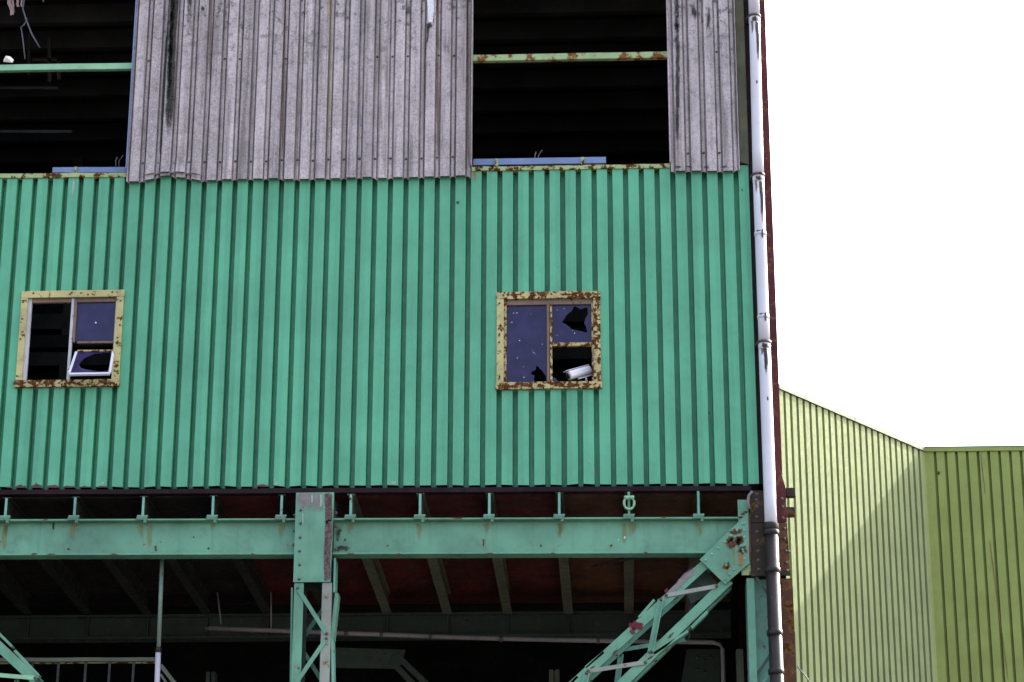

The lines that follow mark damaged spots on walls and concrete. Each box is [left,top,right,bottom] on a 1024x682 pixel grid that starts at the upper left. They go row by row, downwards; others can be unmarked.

damp [160,0,192,153]
rust [499,357,600,388]
rust [723,511,751,573]